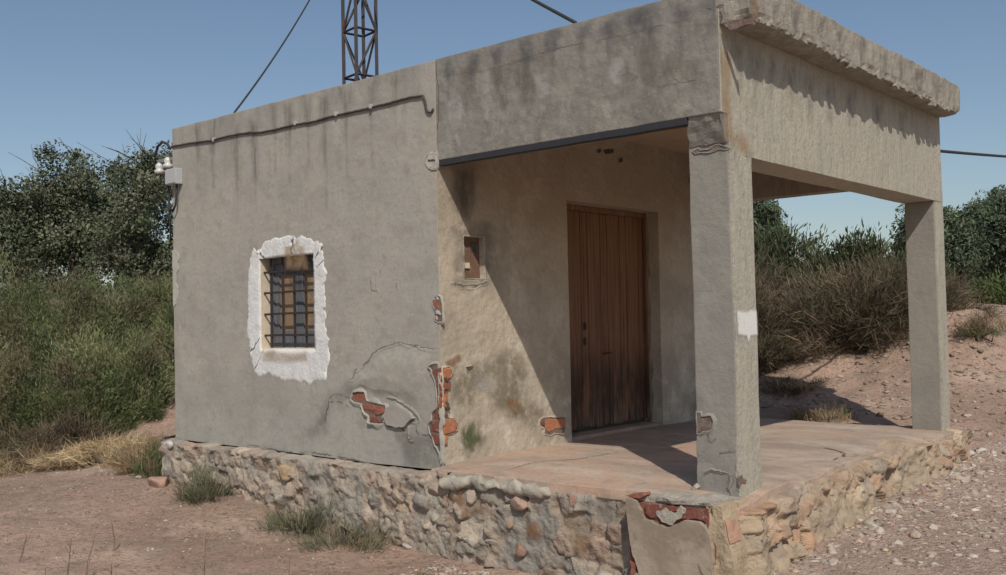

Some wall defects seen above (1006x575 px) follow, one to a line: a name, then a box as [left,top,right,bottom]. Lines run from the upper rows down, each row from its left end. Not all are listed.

spalling [432,294,445,325]
crack [325,342,439,422]
spalling [349,387,415,430]
spalling [427,361,459,467]
spalling [538,414,567,437]
spalling [695,410,717,436]
spalling [626,491,709,529]